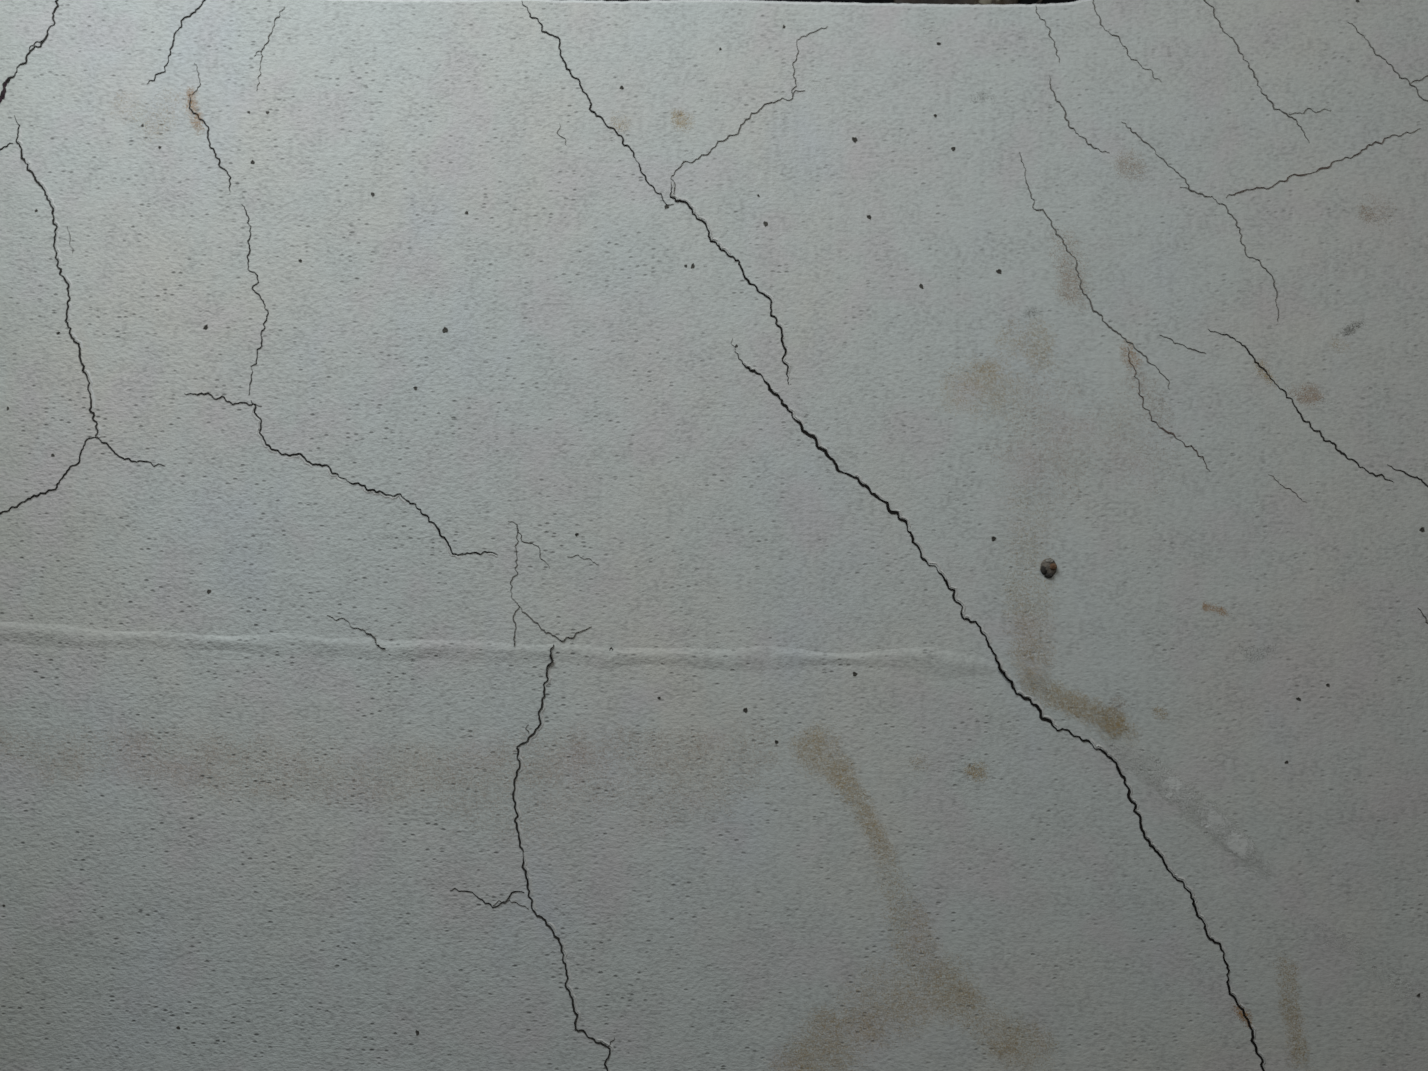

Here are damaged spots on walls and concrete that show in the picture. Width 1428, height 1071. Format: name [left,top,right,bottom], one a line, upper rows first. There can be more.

crack [0,0,165,514]
crack [147,0,615,1071]
crack [522,0,1266,1071]
crack [1019,152,1428,487]
crack [1036,0,1428,321]
leakage [0,719,1058,1071]